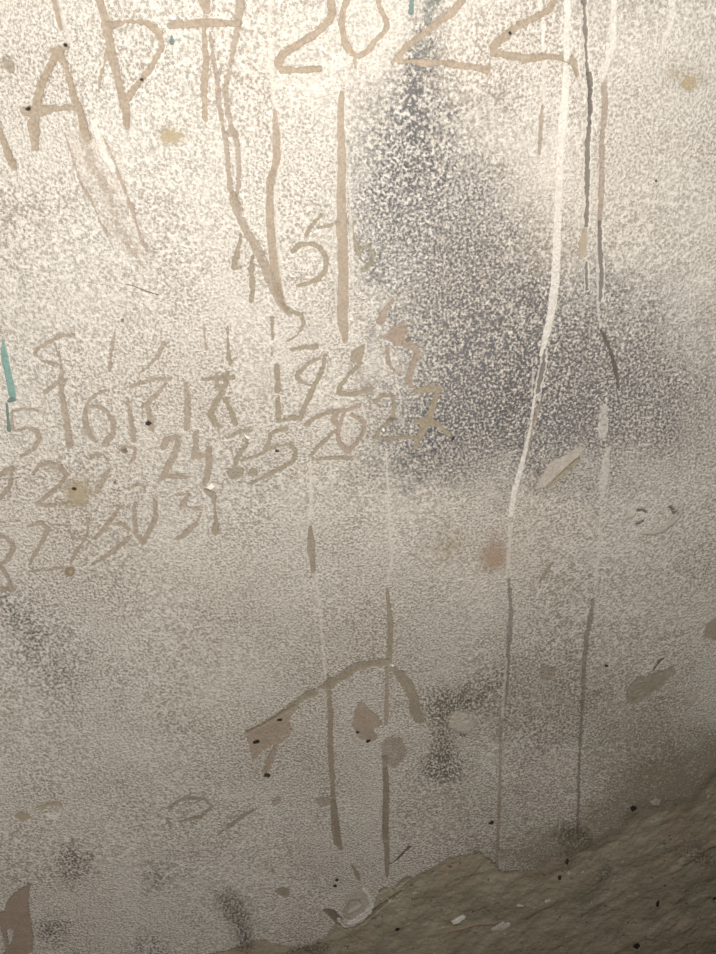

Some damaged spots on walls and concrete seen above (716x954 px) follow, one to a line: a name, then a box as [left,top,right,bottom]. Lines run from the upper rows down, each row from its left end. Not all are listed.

damp [333,0,708,878]
flaking render [627,666,675,704]
peeling [246,706,299,777]
peeling [352,701,406,768]
peeling [165,796,214,829]
flaking render [209,744,716,954]
peeling [0,884,34,954]